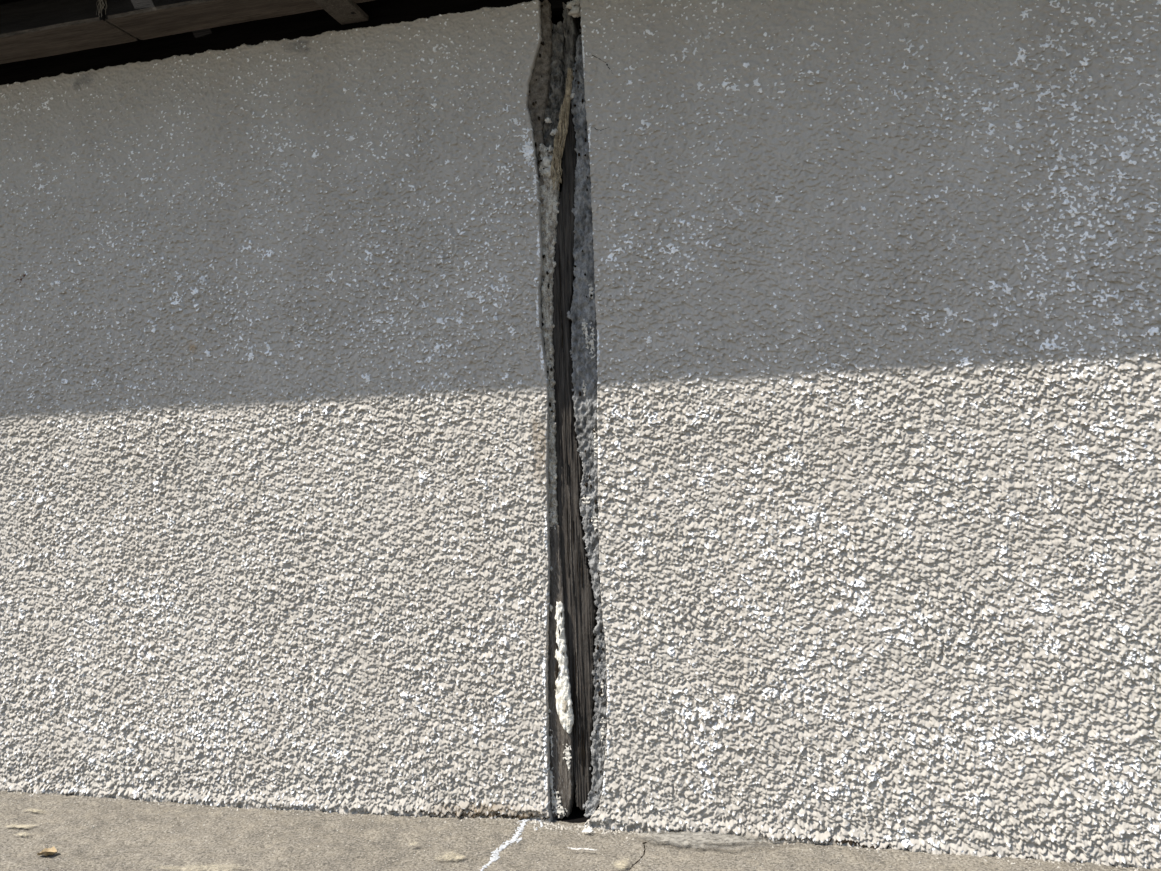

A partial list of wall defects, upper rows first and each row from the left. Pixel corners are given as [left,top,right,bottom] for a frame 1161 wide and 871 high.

crack [567,515,583,602]
crack [573,651,585,774]